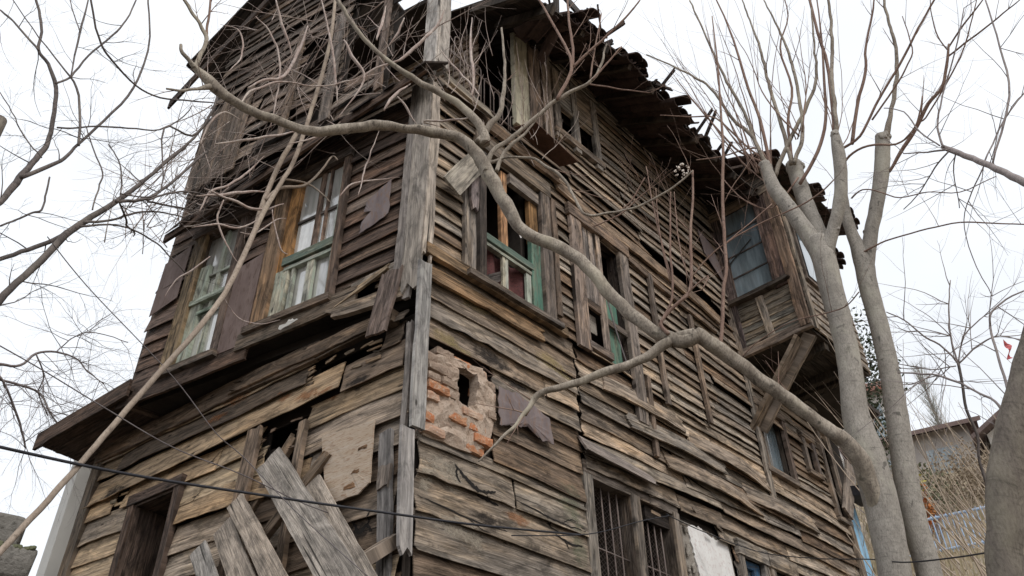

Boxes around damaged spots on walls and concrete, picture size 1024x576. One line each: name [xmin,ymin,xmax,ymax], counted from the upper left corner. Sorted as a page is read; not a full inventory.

spalling [411,346,497,458]
crack [420,464,586,548]